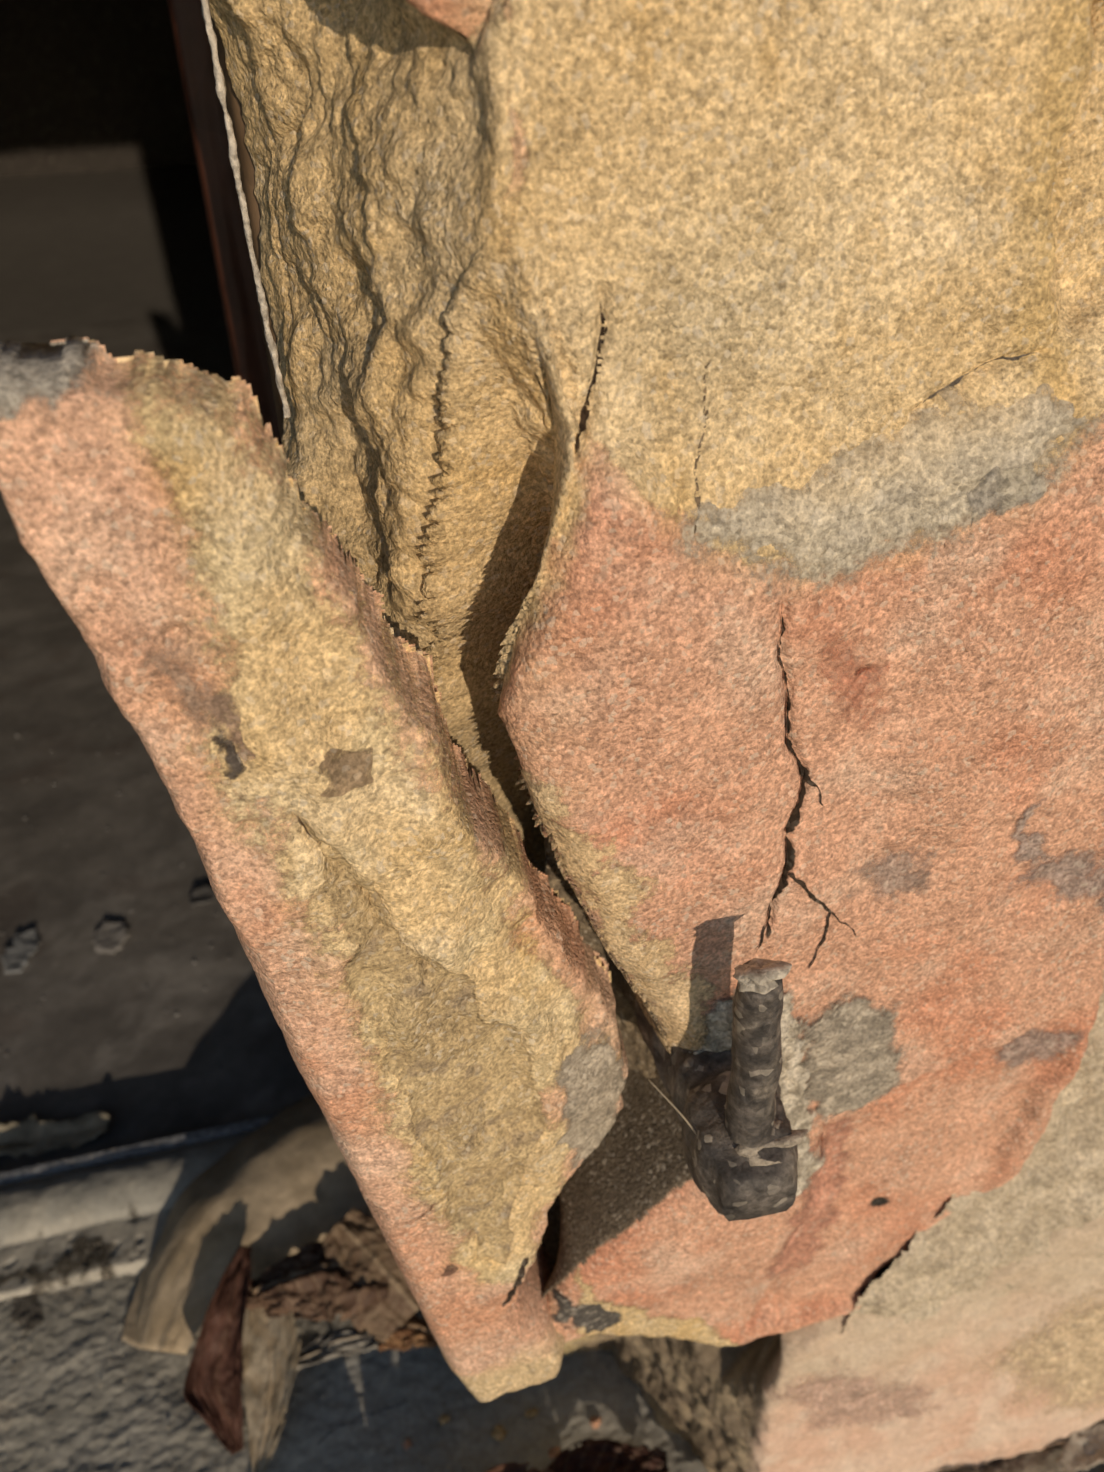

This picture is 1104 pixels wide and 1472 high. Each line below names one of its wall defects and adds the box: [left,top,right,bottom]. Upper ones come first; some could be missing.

crack [756,612,856,968]